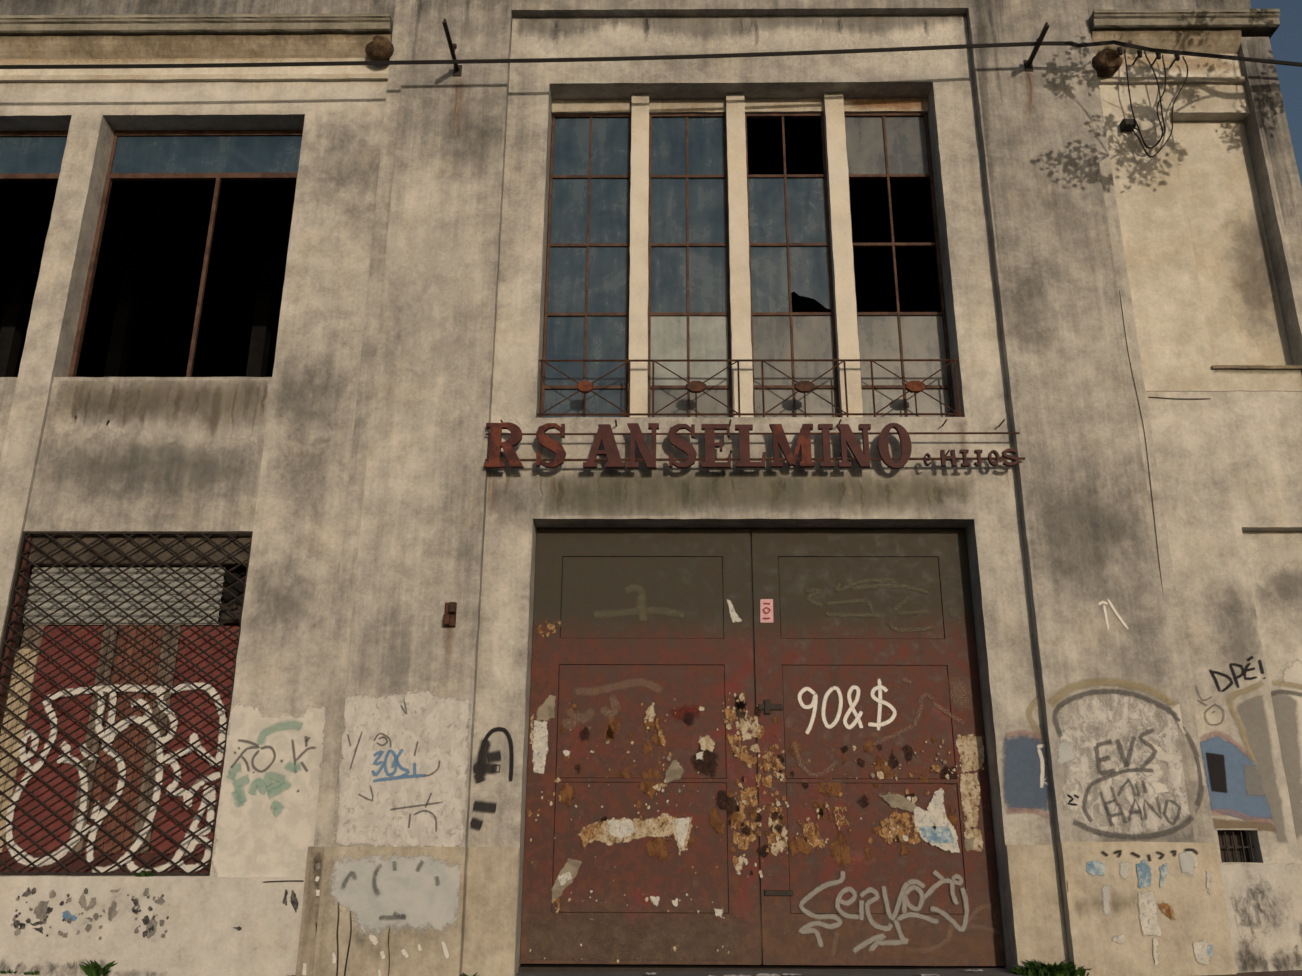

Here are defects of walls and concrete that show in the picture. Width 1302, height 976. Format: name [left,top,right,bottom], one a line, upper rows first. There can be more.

peeling [528,692,983,878]
peeling [11,887,169,940]
peeling [553,872,606,915]
peeling [667,894,725,919]
leakage [1243,951,1300,971]